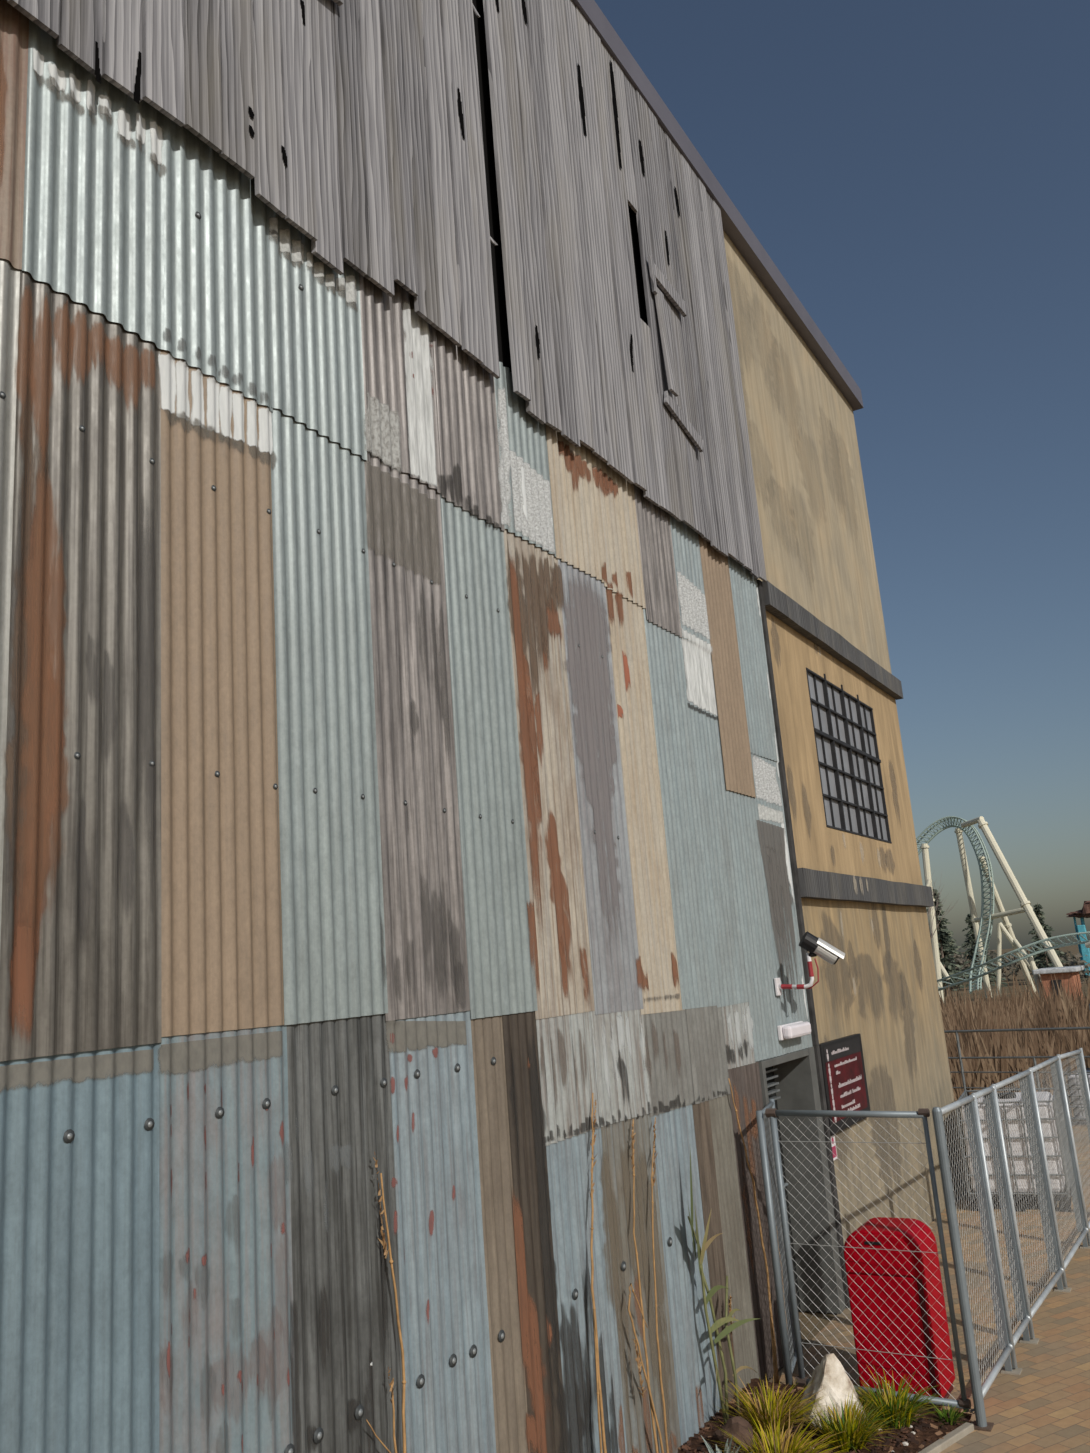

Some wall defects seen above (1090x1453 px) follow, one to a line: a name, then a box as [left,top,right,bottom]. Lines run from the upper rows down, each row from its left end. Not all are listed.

corrosion [558,441,618,497]
corrosion [602,563,633,623]
corrosion [6,288,155,1035]
corrosion [617,651,631,718]
corrosion [507,549,590,1000]
corrosion [636,956,649,989]
corrosion [671,953,679,987]
corrosion [512,1200,552,1453]
corrosion [619,1387,677,1453]
corrosion [696,1388,704,1428]